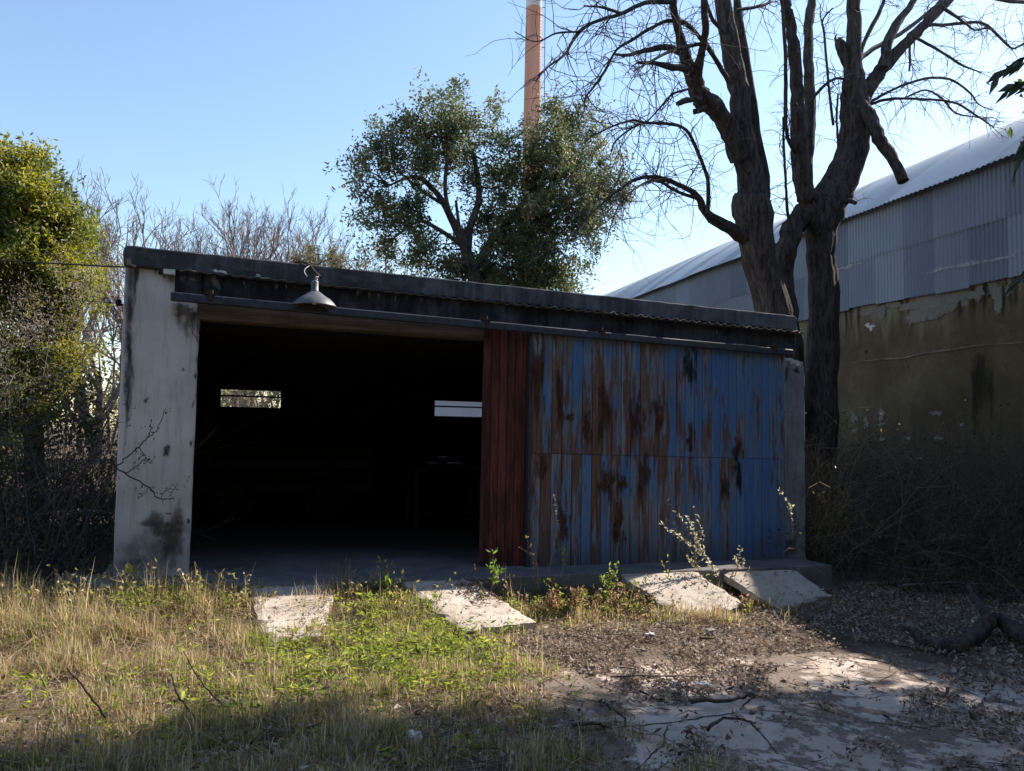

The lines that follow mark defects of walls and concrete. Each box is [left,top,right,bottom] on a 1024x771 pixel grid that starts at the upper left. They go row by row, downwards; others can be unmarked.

peeling [854,277,1014,331]
water stain [125,267,139,420]
rust [530,335,611,442]
water stain [143,510,183,560]
rust [558,501,571,540]
rust [597,451,651,545]
rust [721,437,744,499]